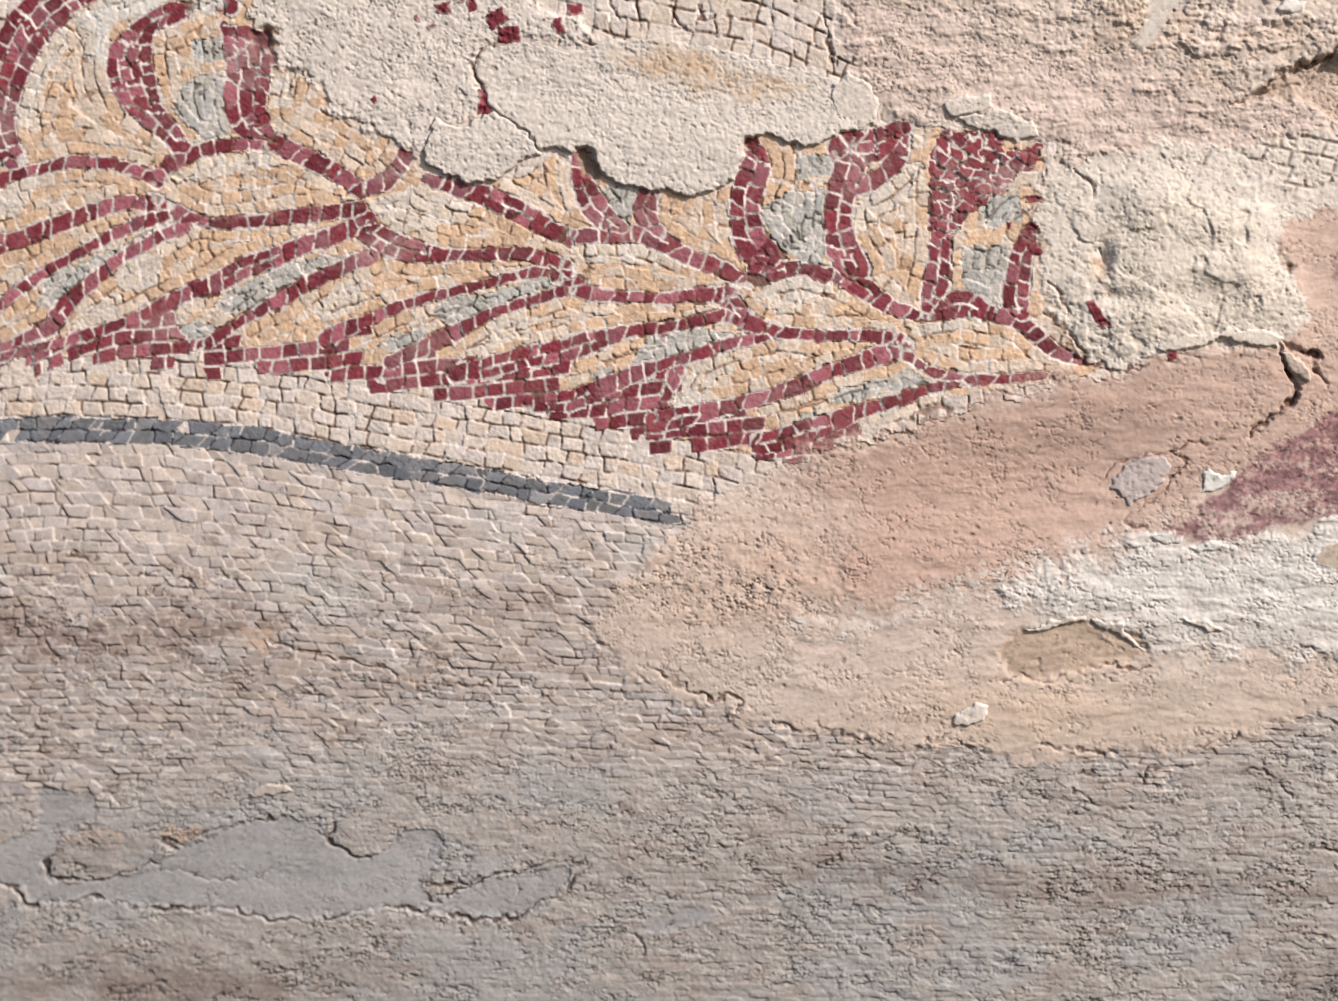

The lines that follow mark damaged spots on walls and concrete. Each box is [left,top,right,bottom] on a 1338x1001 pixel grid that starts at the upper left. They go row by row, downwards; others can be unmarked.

peeling [831,70,880,125]
peeling [943,94,1038,144]
spalling [573,147,609,187]
spalling [742,136,760,157]
crack [1100,340,1330,531]
spalling [1110,456,1172,507]
peeling [1199,469,1237,493]
peeling [1152,535,1183,545]
spalling [995,616,1154,688]
crack [0,814,593,926]